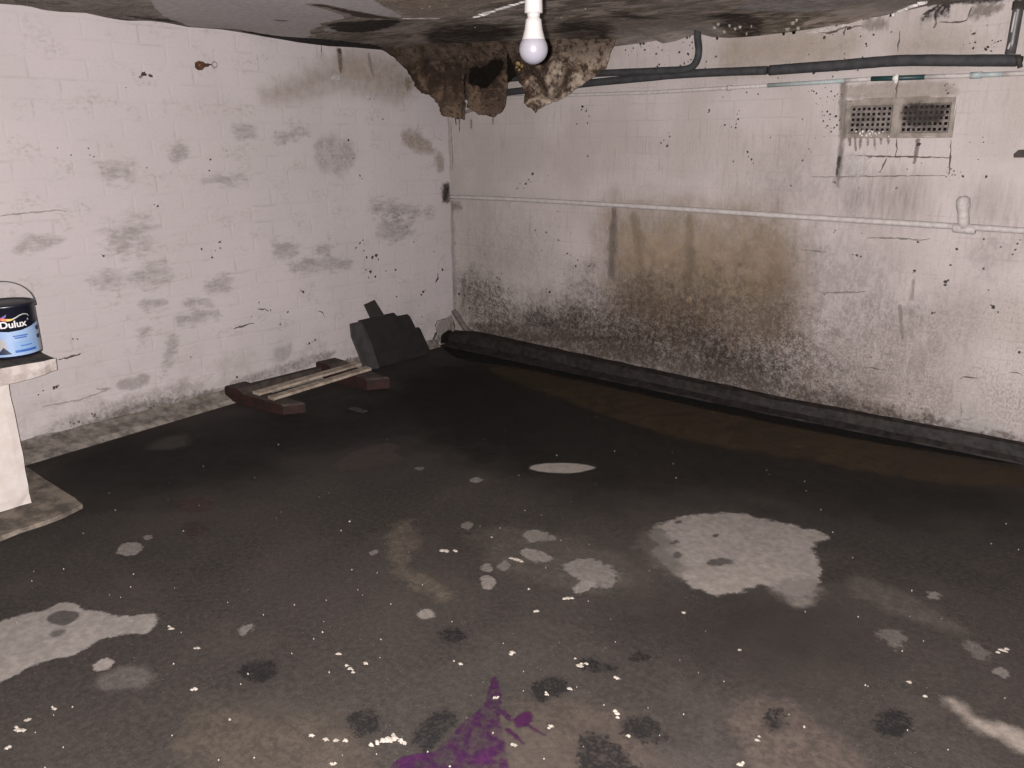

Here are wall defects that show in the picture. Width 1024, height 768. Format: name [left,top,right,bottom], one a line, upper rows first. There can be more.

crack [2,209,66,217]
leakage [455,209,853,407]
leakage [432,344,1024,507]